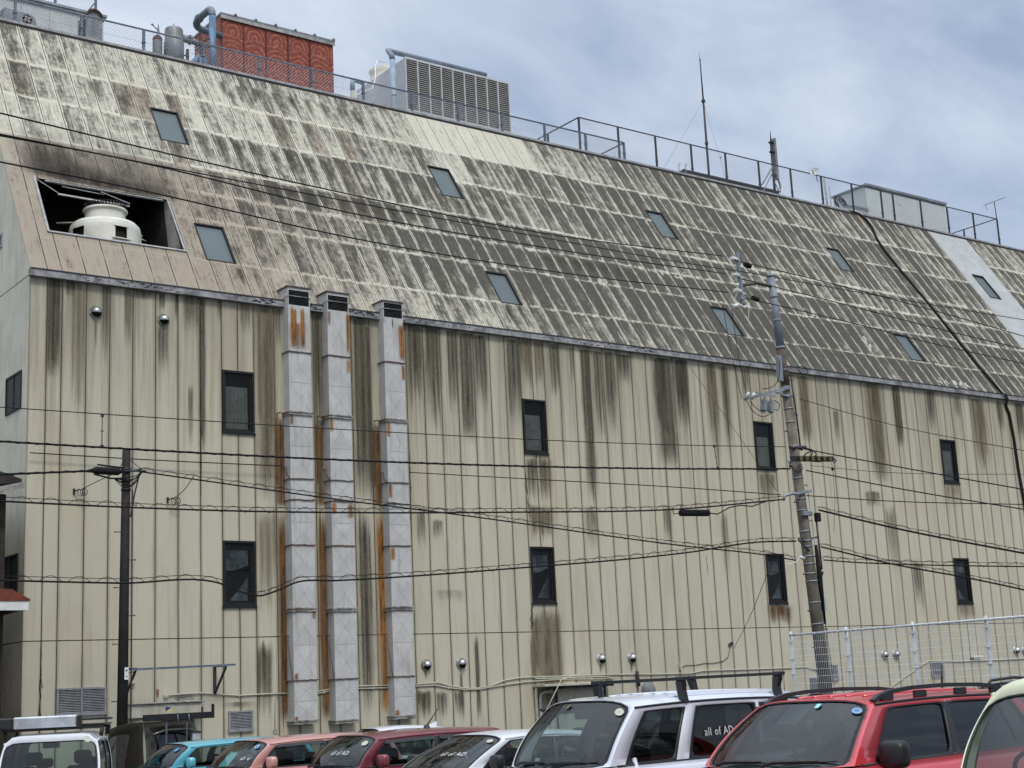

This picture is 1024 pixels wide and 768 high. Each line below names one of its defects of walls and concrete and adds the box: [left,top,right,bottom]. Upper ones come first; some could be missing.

leakage [190,298,205,437]
corrosion [276,414,293,504]
corrosion [316,418,336,512]
corrosion [373,422,392,504]
leakage [408,324,486,430]
leakage [581,350,628,482]
leakage [655,358,688,456]
leakage [867,383,885,475]
leakage [892,386,903,439]
corrosion [278,522,298,721]
corrosion [319,517,330,714]
corrosion [377,521,399,716]